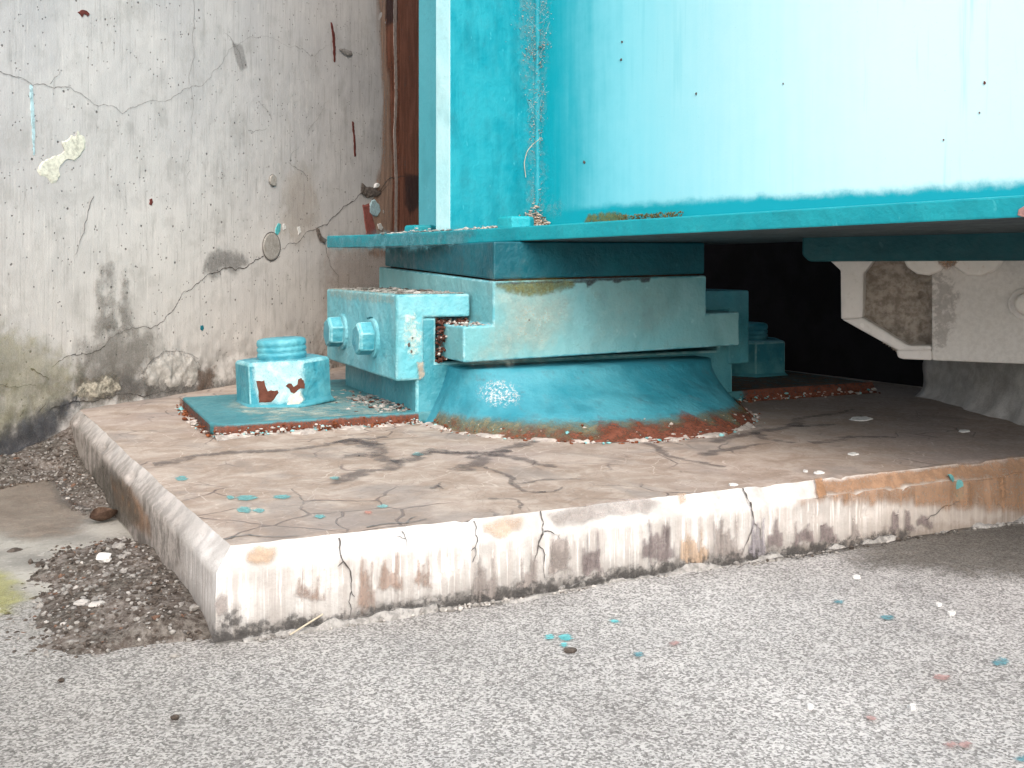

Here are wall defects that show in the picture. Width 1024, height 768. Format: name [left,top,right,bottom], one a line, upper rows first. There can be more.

crack [0,176,405,417]
water stain [0,395,80,456]
spalling [72,373,123,401]
water stain [119,367,232,398]
peeling [256,378,305,403]
rust [180,399,419,438]
rust [433,382,877,442]
rust [816,458,1024,512]
crack [534,511,560,577]
crack [742,488,761,552]
crack [338,538,355,615]